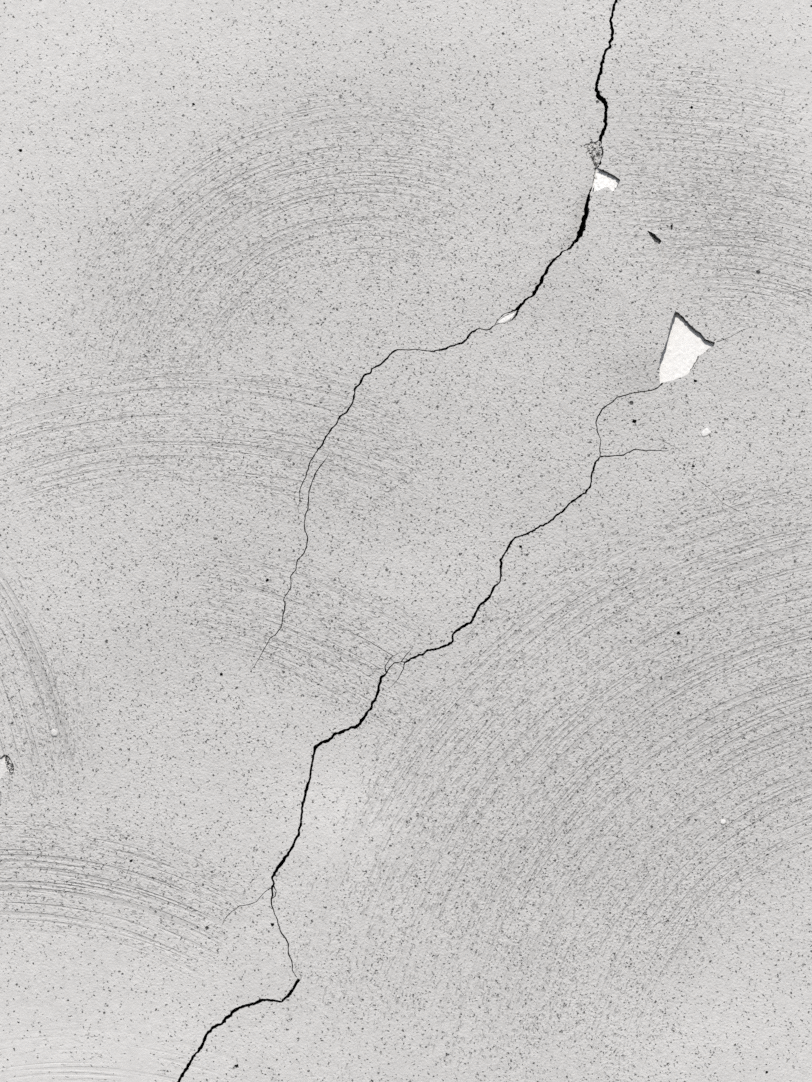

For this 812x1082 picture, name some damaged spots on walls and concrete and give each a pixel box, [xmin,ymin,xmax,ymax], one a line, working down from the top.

crack [252,0,618,669]
peeling [498,141,715,450]
crack [177,395,681,1082]